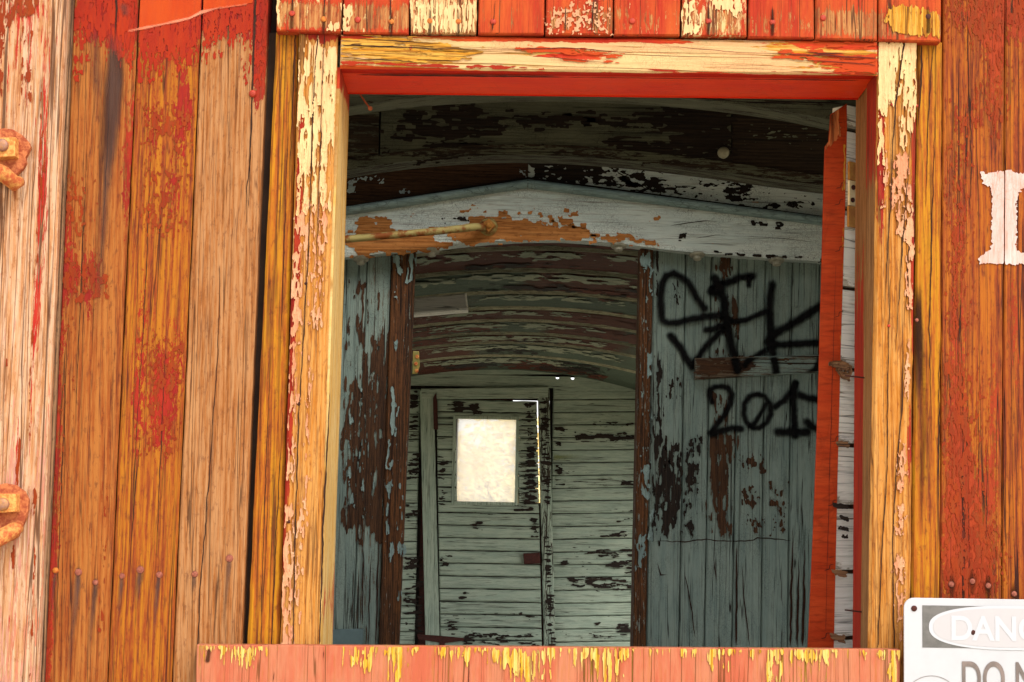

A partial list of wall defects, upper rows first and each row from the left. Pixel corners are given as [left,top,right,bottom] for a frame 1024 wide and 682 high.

peeling [73,0,282,87]
peeling [681,0,742,35]
peeling [133,95,195,239]
peeling [374,103,815,209]
peeling [751,4,940,310]
peeling [714,250,821,280]
peeling [281,0,545,644]
peeling [340,204,790,682]
peeling [206,646,268,669]
peeling [649,633,846,682]